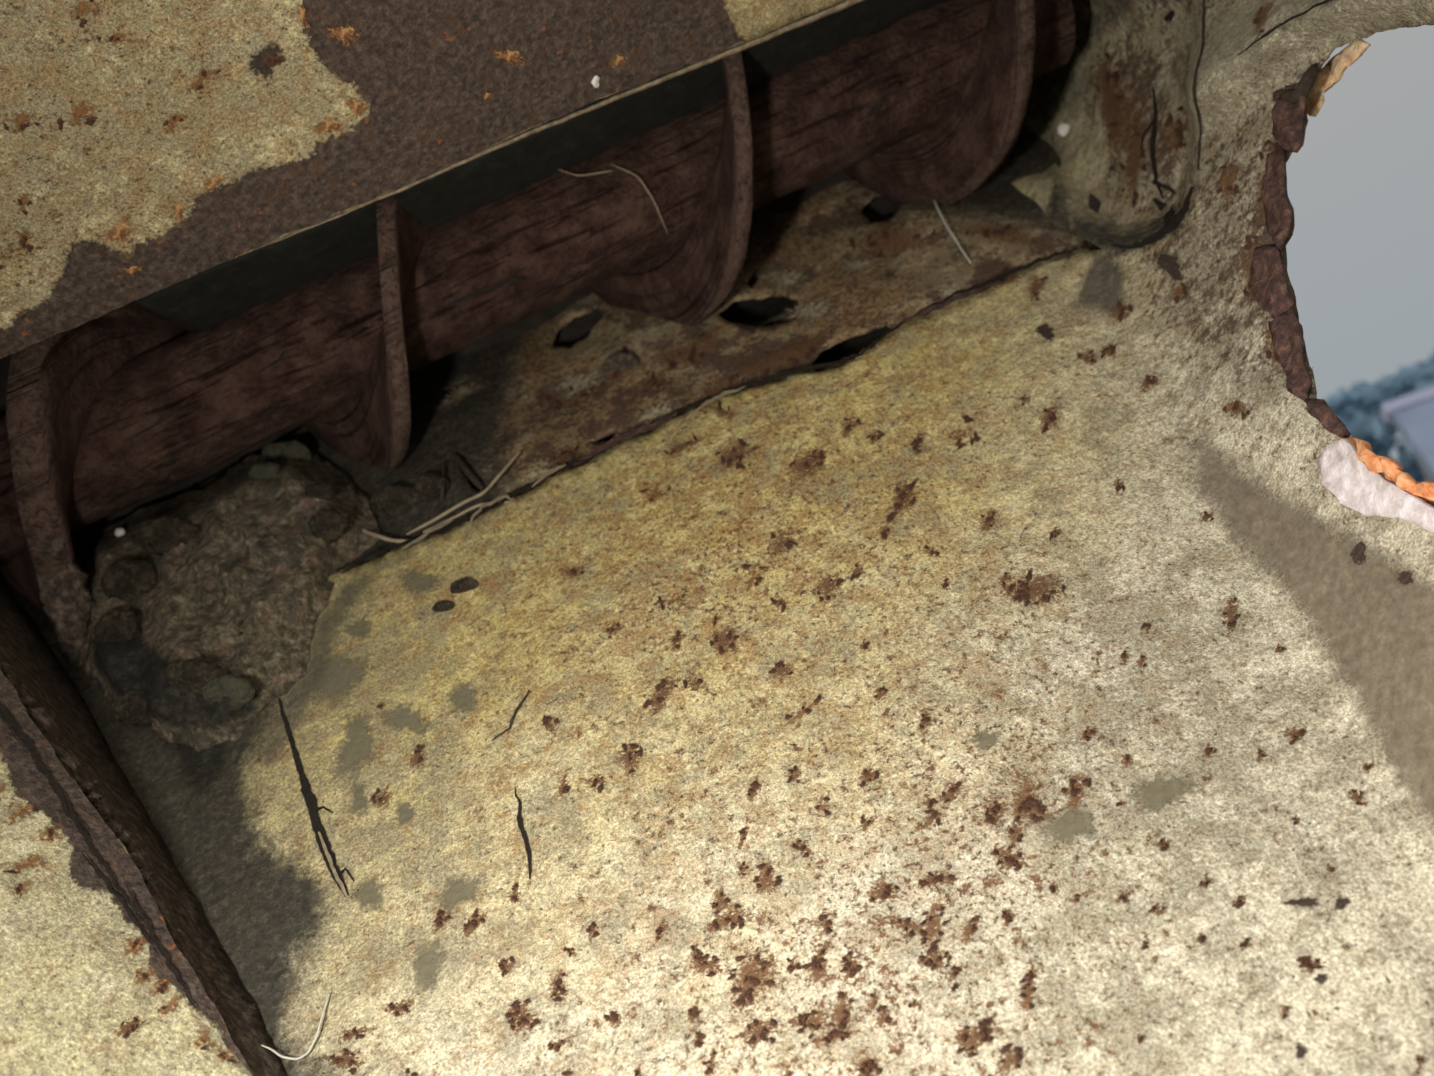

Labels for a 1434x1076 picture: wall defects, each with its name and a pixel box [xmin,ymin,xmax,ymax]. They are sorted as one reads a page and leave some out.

crack [1238,0,1331,55]
peeling [0,0,744,358]
rust [1217,39,1434,506]
peeling [1317,439,1434,533]
crack [278,698,357,899]
rust [982,772,1092,874]
rust [502,947,577,1053]
rust [688,1001,718,1076]
rust [689,775,891,1049]
rust [866,870,983,992]
rust [944,1014,1028,1076]
rust [1296,955,1329,974]